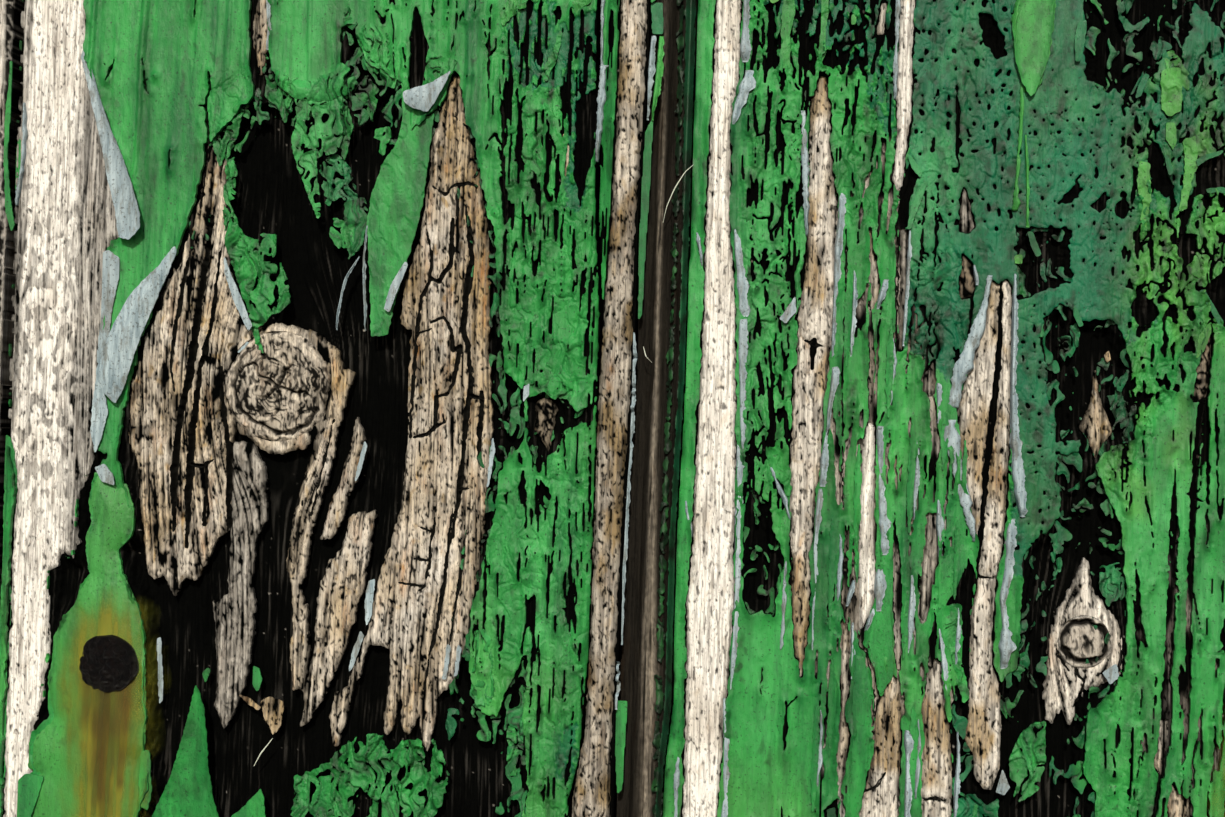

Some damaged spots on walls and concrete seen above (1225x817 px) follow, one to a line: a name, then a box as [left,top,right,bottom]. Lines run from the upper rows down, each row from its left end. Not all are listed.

peeling [1117,0,1150,33]
peeling [521,132,544,176]
spalling [1057,161,1152,233]
peeling [1135,50,1225,211]
peeling [0,0,495,817]
crack [398,2,509,690]
peeling [572,0,756,817]
peeling [770,0,1041,817]
peeling [1079,370,1112,458]
peeling [1191,254,1223,401]
corrosion [78,606,141,817]
peeling [1042,533,1123,725]